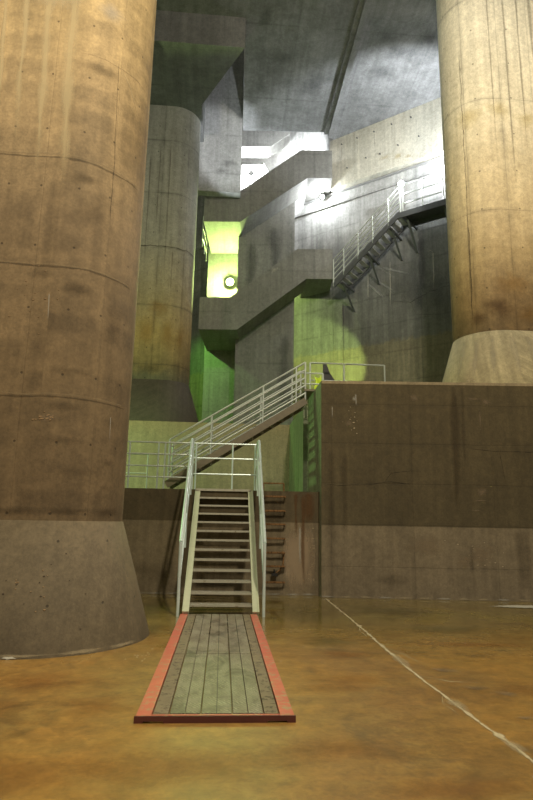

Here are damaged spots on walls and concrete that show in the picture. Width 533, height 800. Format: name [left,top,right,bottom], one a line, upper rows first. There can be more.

crack [325,598,533,763]